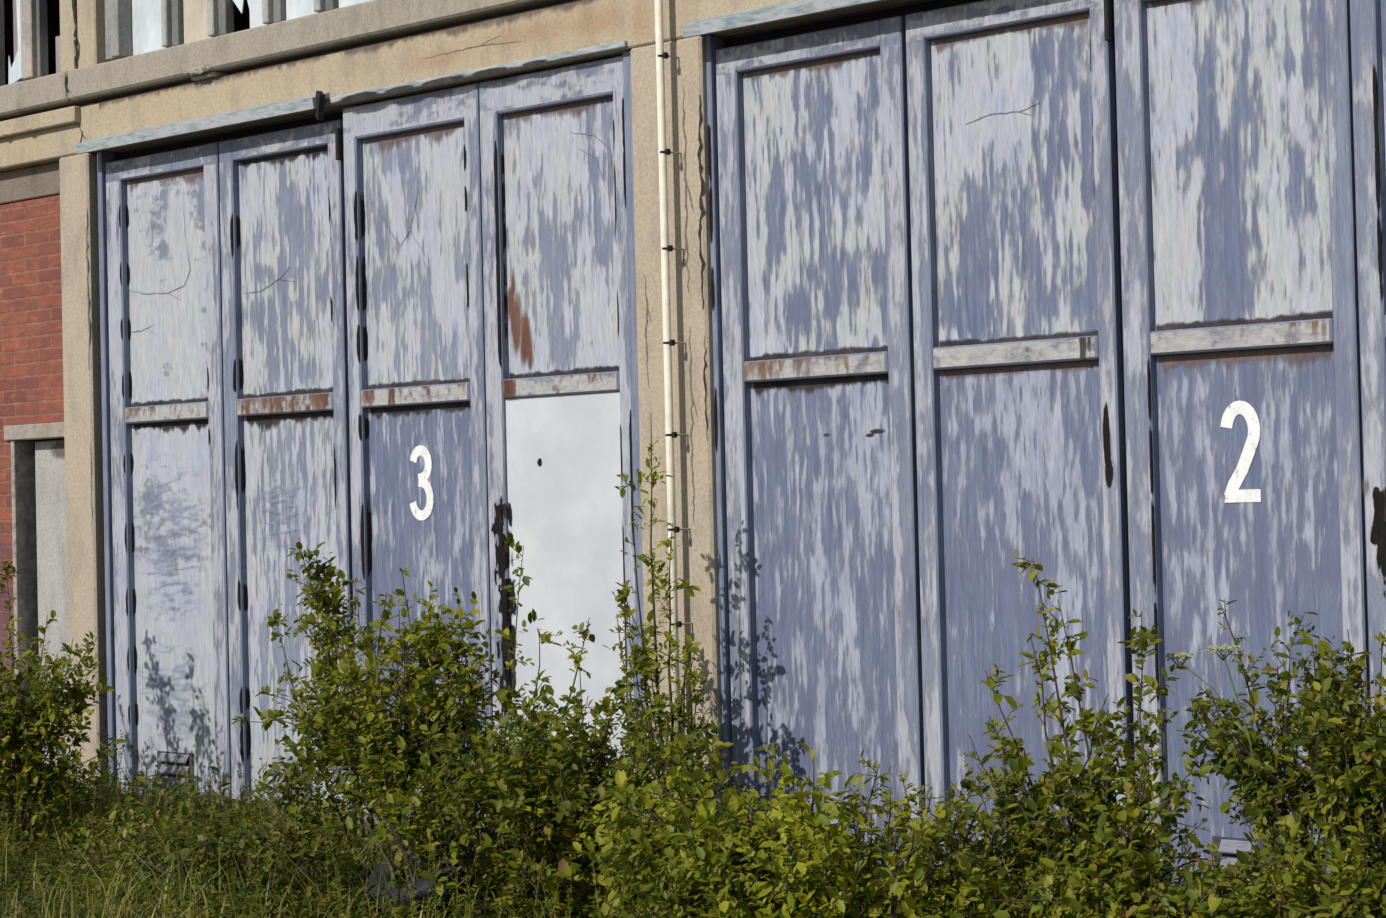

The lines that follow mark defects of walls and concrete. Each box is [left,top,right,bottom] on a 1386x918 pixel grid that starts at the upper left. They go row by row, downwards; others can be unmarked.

crack [967,102,1040,124]
crack [129,213,190,337]
corrosion [508,274,533,368]
crack [643,274,651,387]
crack [682,88,708,520]
corrosion [241,393,330,415]
peeling [106,57,637,821]
corrosion [363,388,400,407]
peeling [716,0,1386,871]